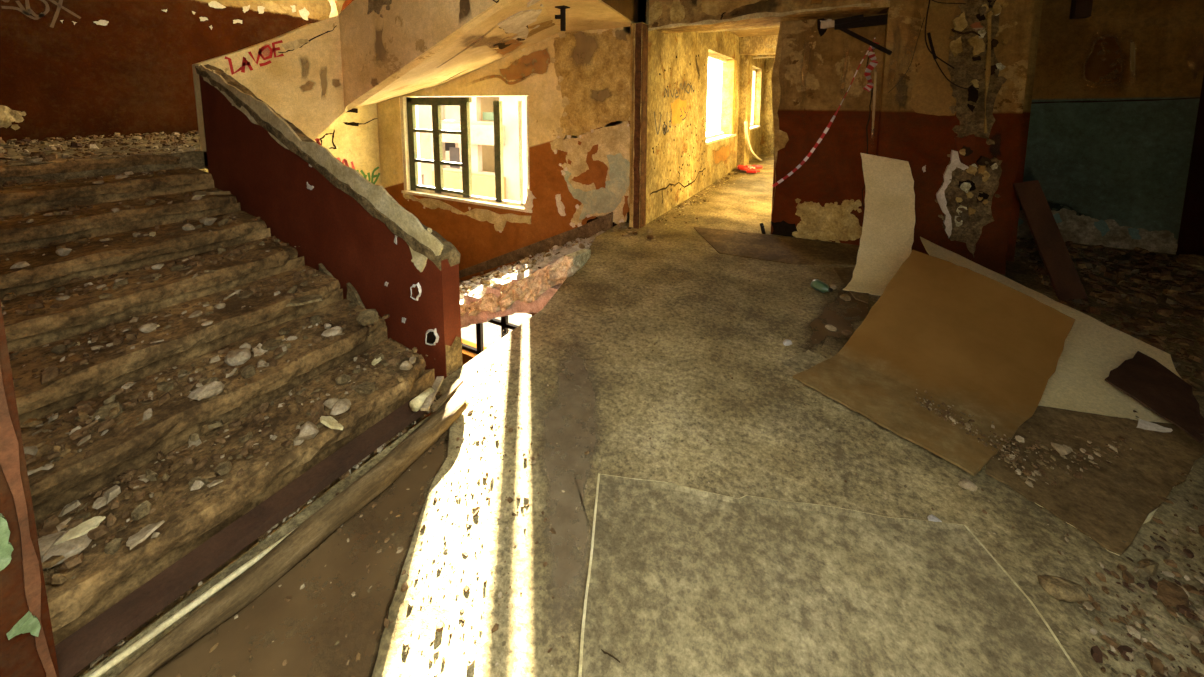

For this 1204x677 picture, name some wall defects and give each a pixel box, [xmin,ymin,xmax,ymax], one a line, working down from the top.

peeling [192,1,265,30]
peeling [290,5,310,20]
spalling [0,105,26,130]
peeling [498,0,631,228]
spalling [909,0,1009,257]
spalling [792,198,862,243]
peeling [1051,208,1178,255]
peeling [0,365,57,677]